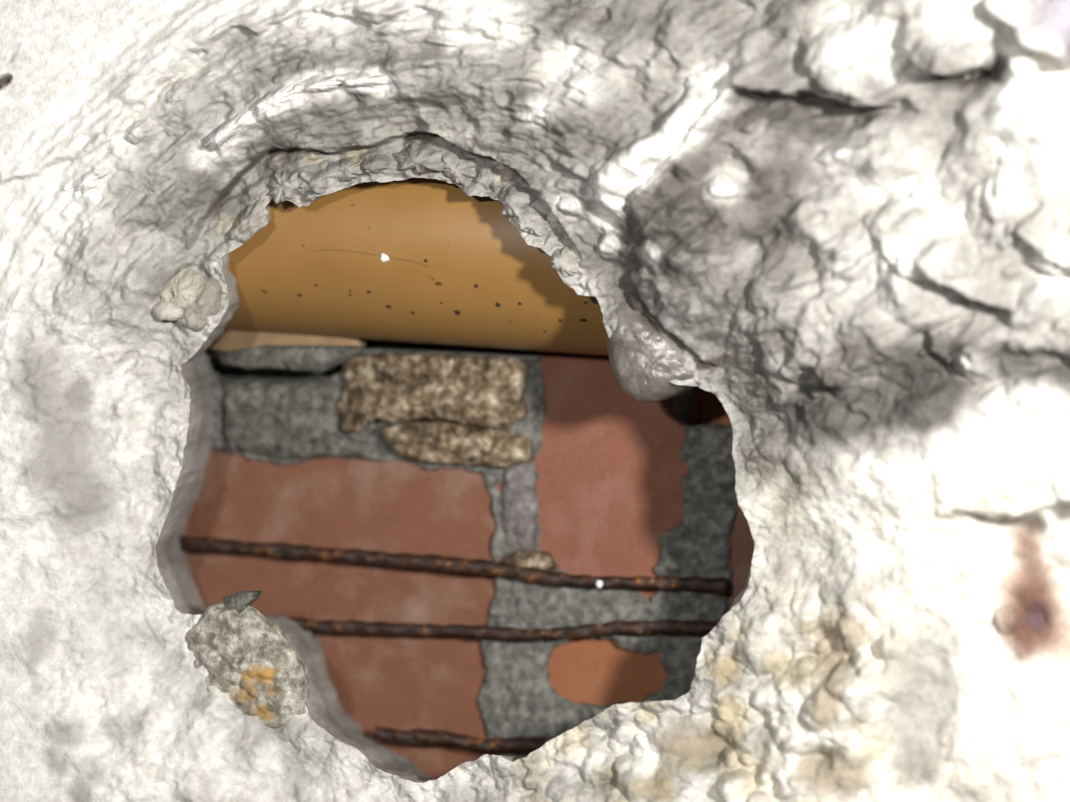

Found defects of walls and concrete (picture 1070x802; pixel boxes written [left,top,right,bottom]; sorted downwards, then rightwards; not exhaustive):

crack [830,92,876,112]
spalling [226,141,580,278]
crack [959,475,1070,529]
rust [1003,561,1065,652]
spalling [812,608,858,724]
spalling [799,752,862,795]